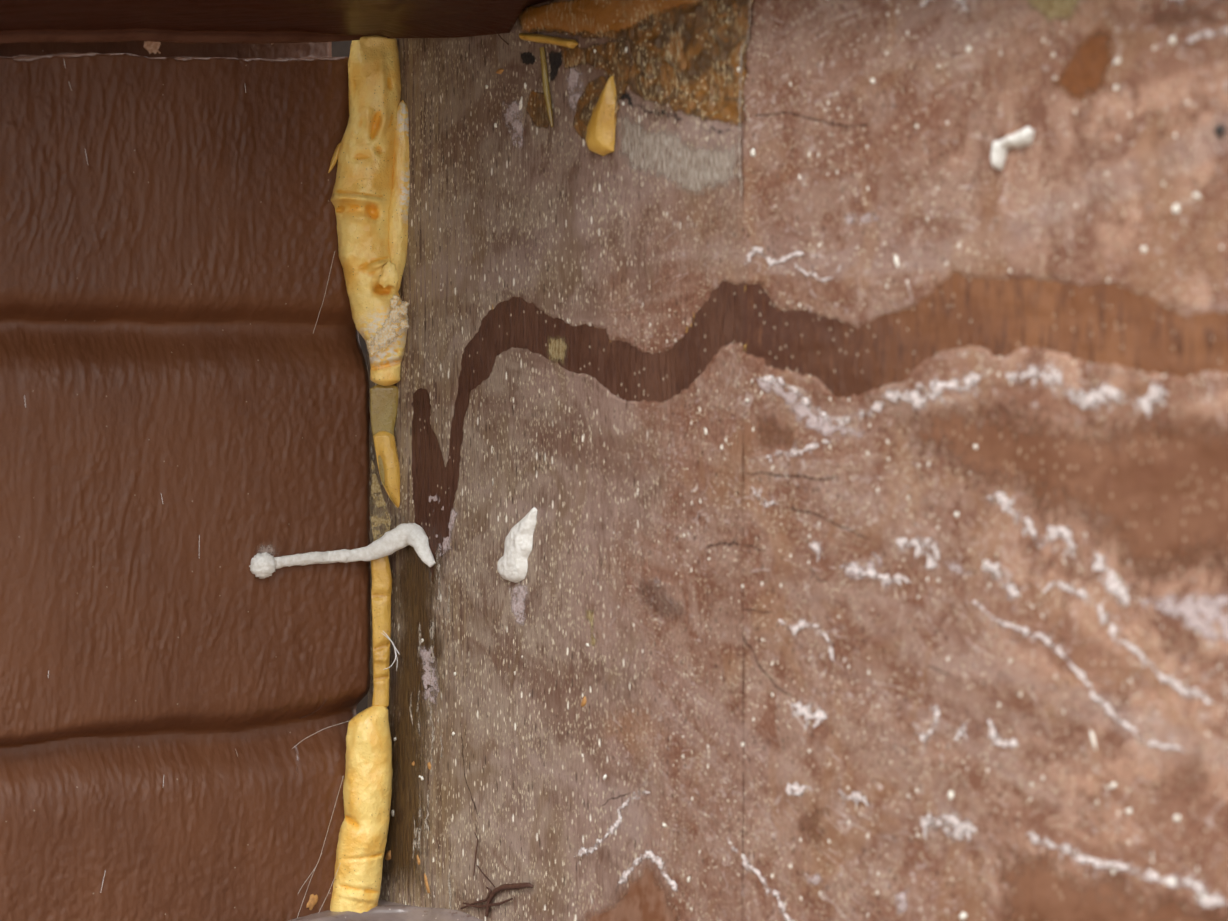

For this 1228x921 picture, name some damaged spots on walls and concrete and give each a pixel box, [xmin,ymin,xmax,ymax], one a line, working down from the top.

peeling [411,272,1228,583]
water stain [759,372,980,464]
water stain [1005,363,1168,419]
water stain [987,492,1076,559]
water stain [840,557,910,588]
water stain [895,537,1020,600]
water stain [1043,552,1228,705]
water stain [792,701,828,729]
water stain [972,600,1187,754]
water stain [920,812,977,841]
water stain [728,839,791,921]
water stain [1027,832,1225,909]